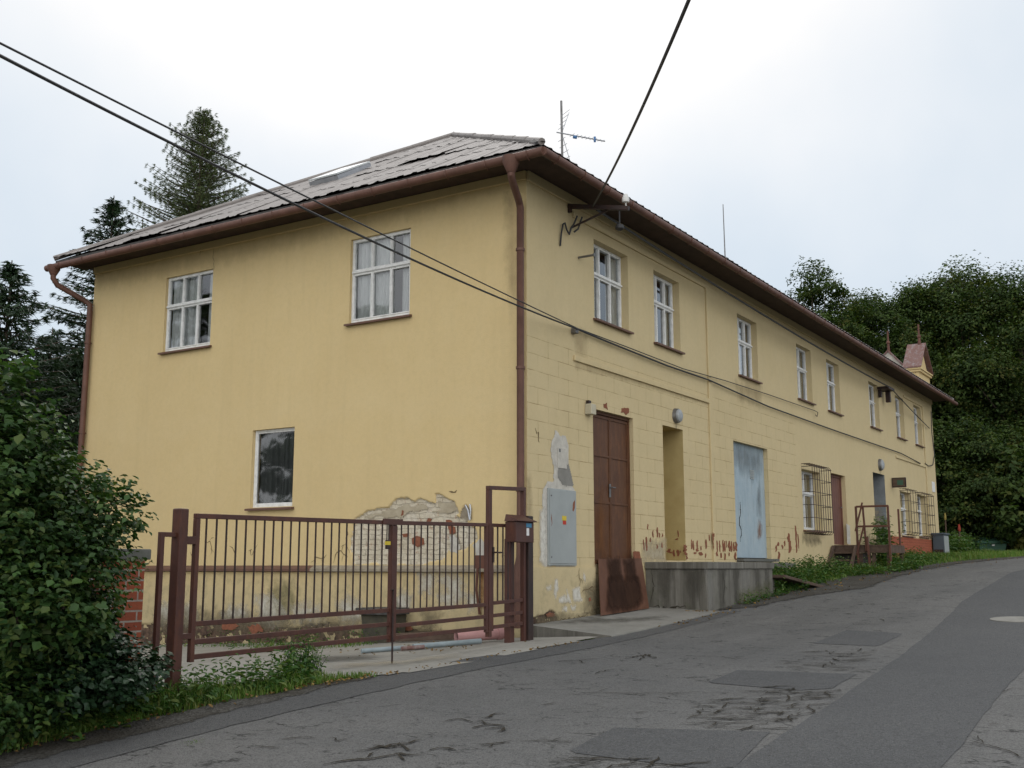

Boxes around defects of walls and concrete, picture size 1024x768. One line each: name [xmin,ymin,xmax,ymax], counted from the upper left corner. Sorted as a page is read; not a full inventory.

flaking render [350,490,484,565]
peeling [633,524,738,560]
peeling [775,526,799,559]